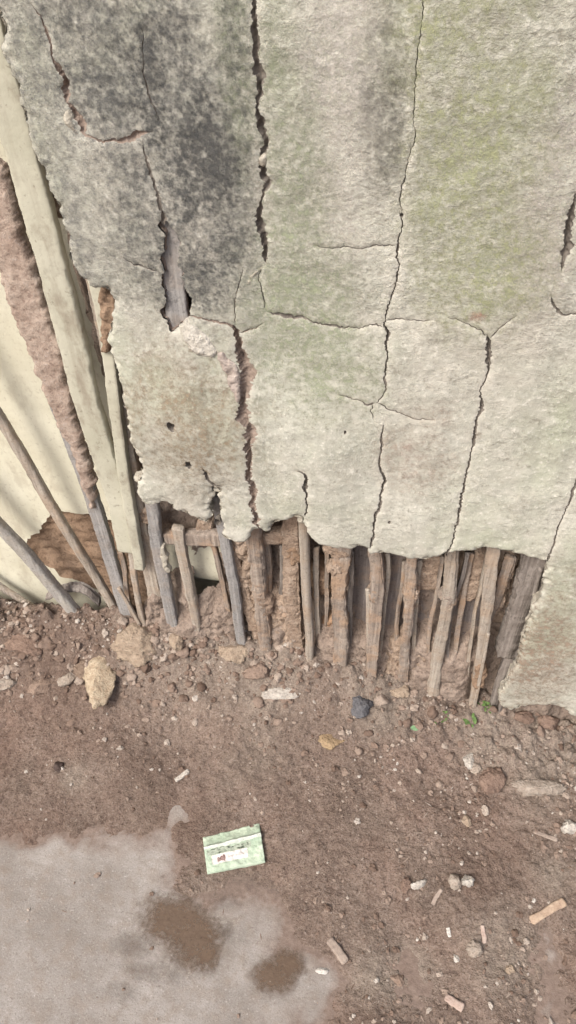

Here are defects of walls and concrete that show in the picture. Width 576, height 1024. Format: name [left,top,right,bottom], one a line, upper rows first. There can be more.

crack [31,4,167,225]
crack [560,193,576,272]
spalling [98,287,115,353]
crack [189,0,511,556]
crack [551,297,576,316]
peeling [27,511,115,607]
peeling [108,520,148,606]
spalling [159,486,229,539]
crack [547,480,576,561]